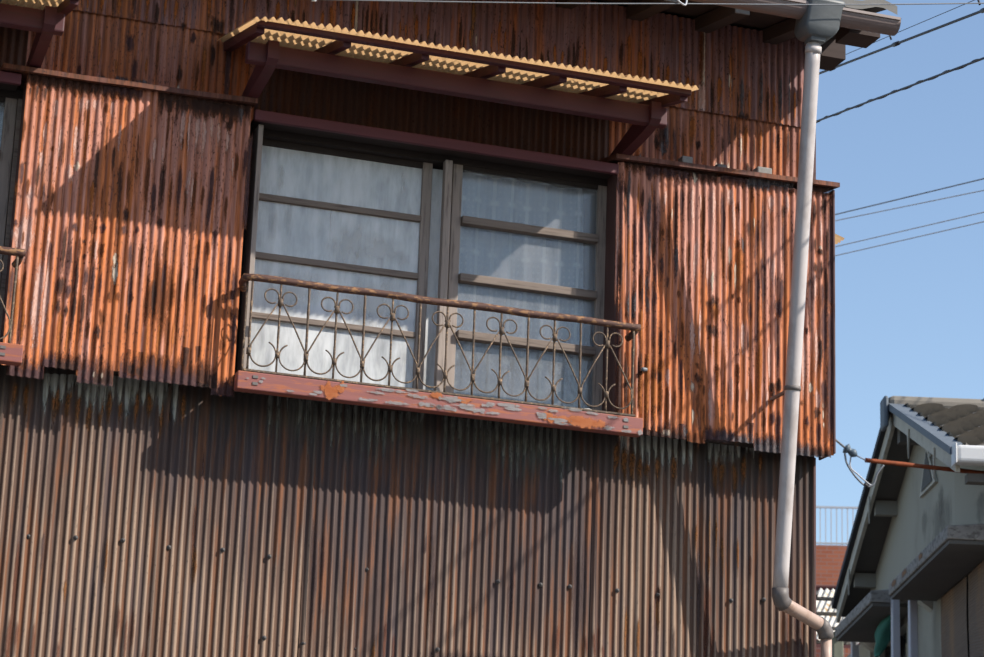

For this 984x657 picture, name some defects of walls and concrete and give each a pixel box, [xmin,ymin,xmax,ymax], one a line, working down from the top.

rust [321,1,388,36]
rust [491,20,528,60]
rust [540,41,586,67]
rust [619,34,670,83]
rust [7,0,253,435]
rust [614,53,796,473]
rust [796,185,835,458]
peeling [309,380,348,400]
peeling [359,388,522,415]
peeling [537,406,643,435]
rust [5,622,18,657]
rust [585,629,604,657]